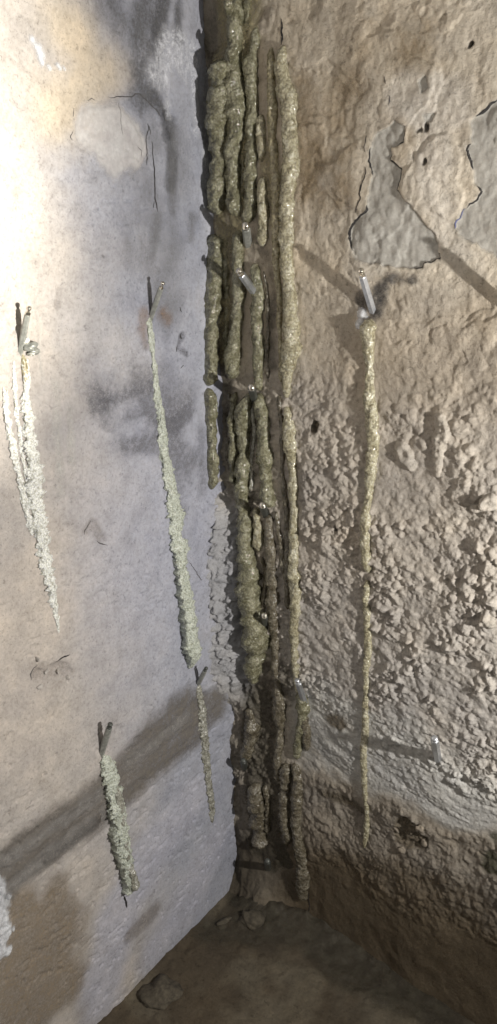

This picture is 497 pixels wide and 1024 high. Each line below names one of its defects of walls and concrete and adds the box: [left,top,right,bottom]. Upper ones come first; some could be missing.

crack [70,93,160,212]
peeling [348,121,441,269]
peeling [456,100,497,255]
water stain [124,376,203,474]